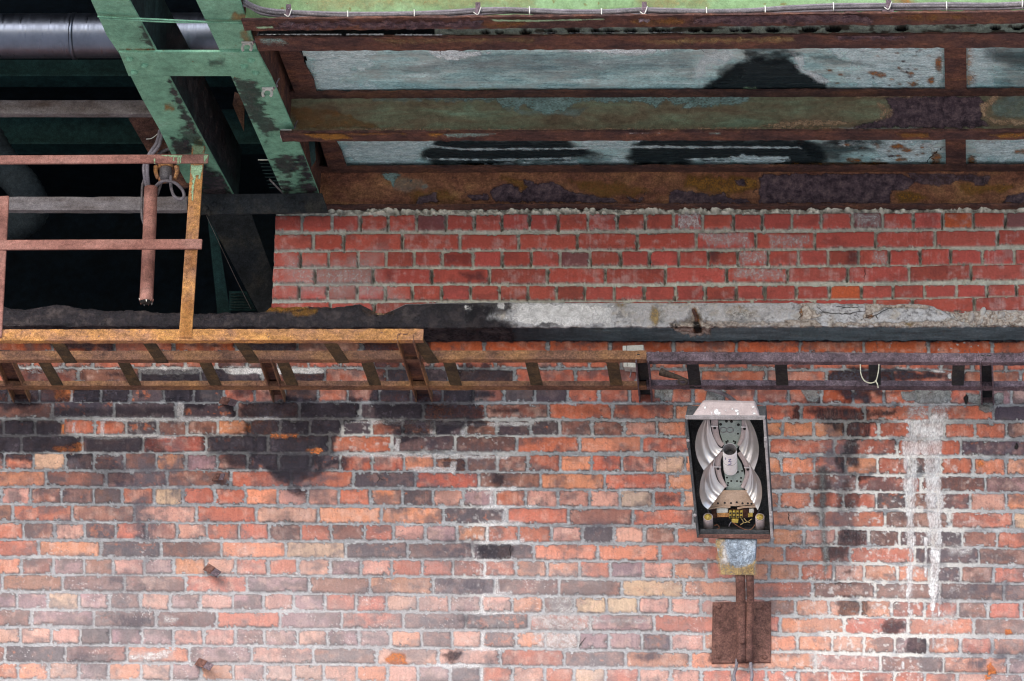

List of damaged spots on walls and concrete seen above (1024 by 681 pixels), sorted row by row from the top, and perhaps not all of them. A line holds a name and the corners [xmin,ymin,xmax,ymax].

water stain [308,50,378,91]
water stain [430,49,667,70]
water stain [699,49,828,89]
water stain [831,48,943,89]
peeling [980,96,1024,126]
water stain [344,140,941,165]
water stain [974,140,1024,164]
water stain [468,303,512,330]
spalling [669,303,1024,338]
crack [798,306,901,320]
water stain [202,436,257,469]
water stain [902,406,971,617]